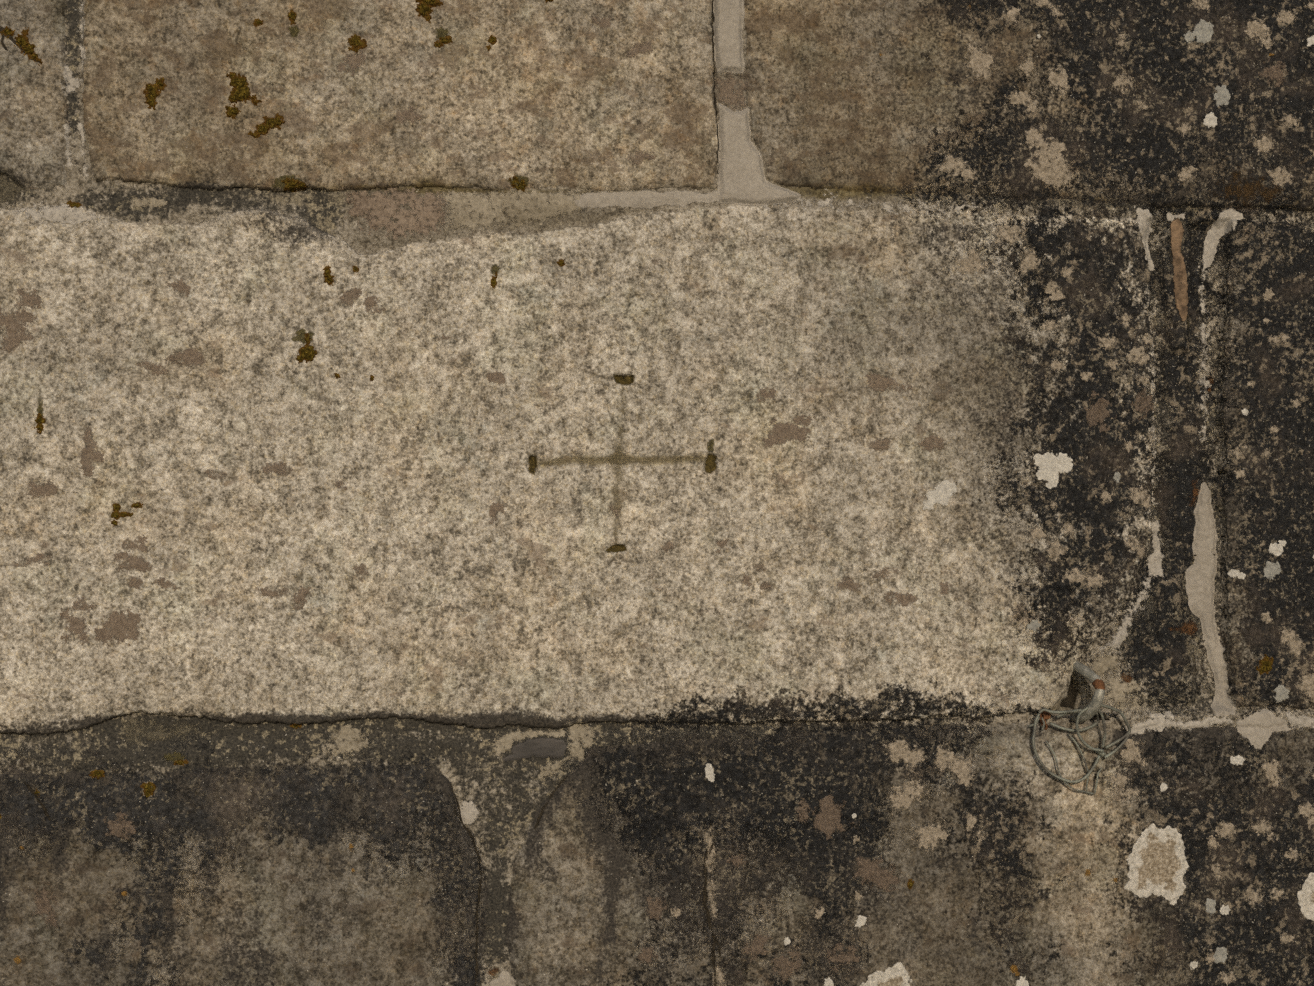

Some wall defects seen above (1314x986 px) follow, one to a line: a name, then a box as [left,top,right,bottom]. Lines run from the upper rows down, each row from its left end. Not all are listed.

crack [0,26,40,63]
water stain [907,0,1314,986]
water stain [0,740,493,986]
water stain [571,681,1064,986]